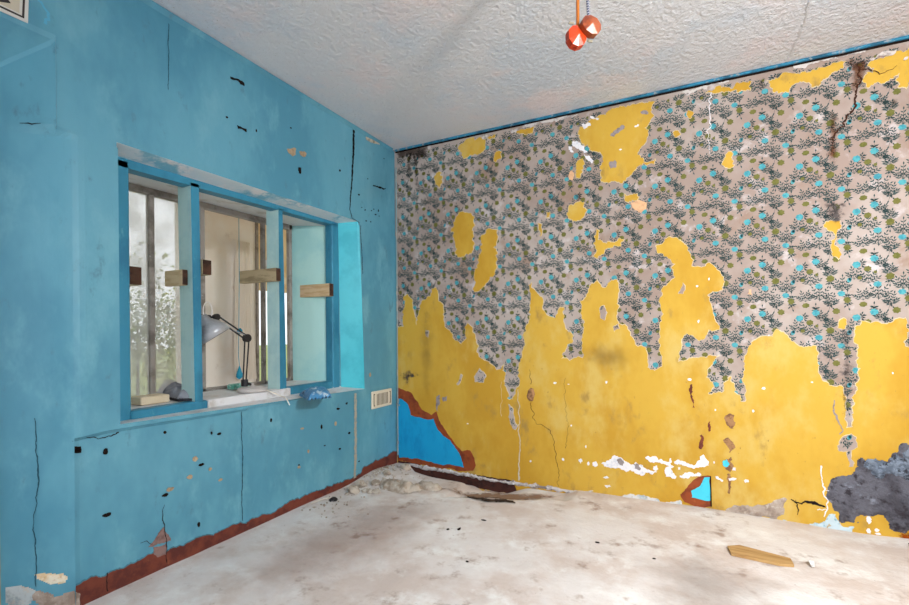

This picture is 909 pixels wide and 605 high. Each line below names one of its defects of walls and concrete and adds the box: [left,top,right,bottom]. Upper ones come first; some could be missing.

peeling [680,80,752,95]
peeling [767,48,909,94]
crack [832,66,896,148]
peeling [457,134,502,163]
peeling [511,100,656,203]
crack [349,130,363,272]
peeling [451,211,499,292]
peeling [566,201,587,222]
peeling [823,220,842,260]
peeling [5,236,909,605]
crack [32,418,40,587]
crack [791,466,829,517]